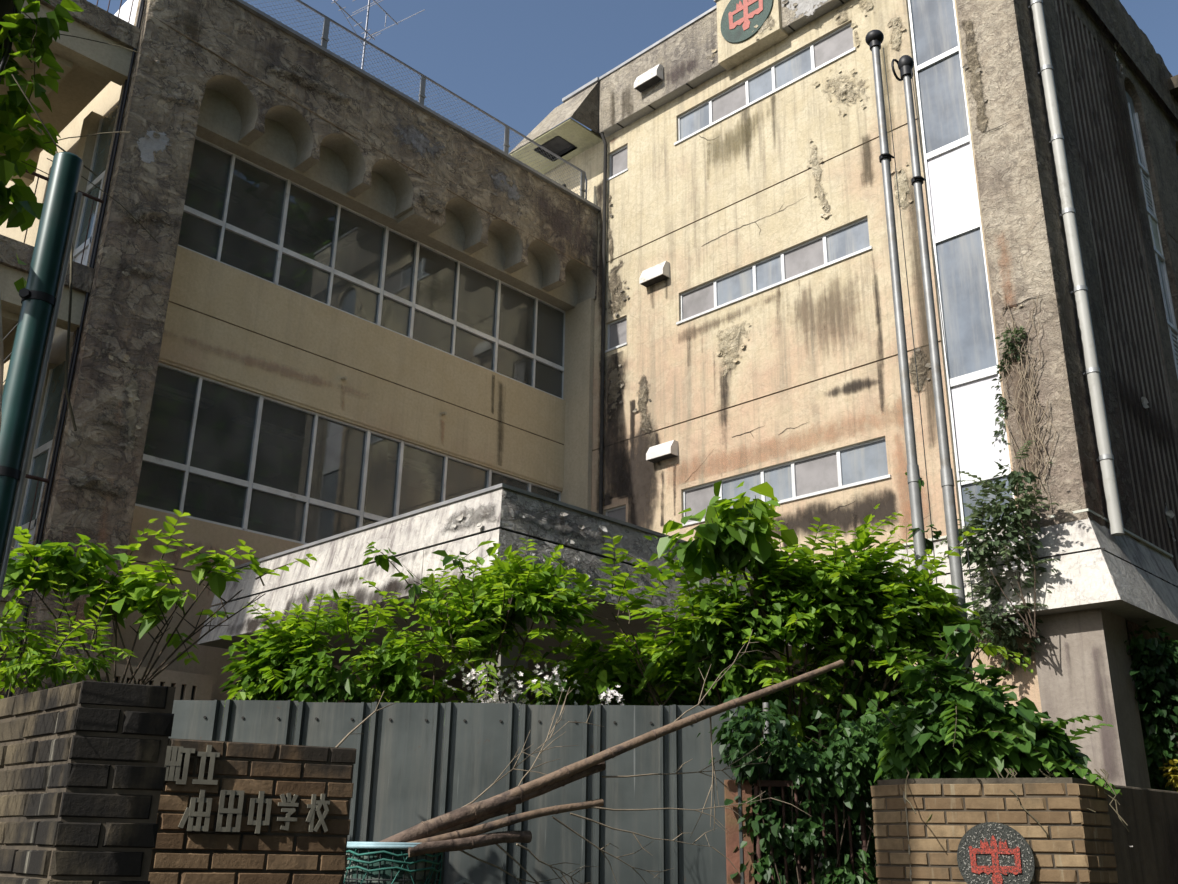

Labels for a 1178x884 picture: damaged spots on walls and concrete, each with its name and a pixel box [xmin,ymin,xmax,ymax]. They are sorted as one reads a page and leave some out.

spalling [781,0,827,21]
peeling [834,5,860,46]
peeling [812,64,868,115]
spalling [137,131,171,164]
leakage [713,108,750,156]
peeling [807,138,831,218]
leakage [540,181,603,315]
leakage [801,292,846,336]
peeling [717,323,750,376]
leakage [829,283,883,411]
leakage [597,352,676,529]
leakage [772,491,896,547]